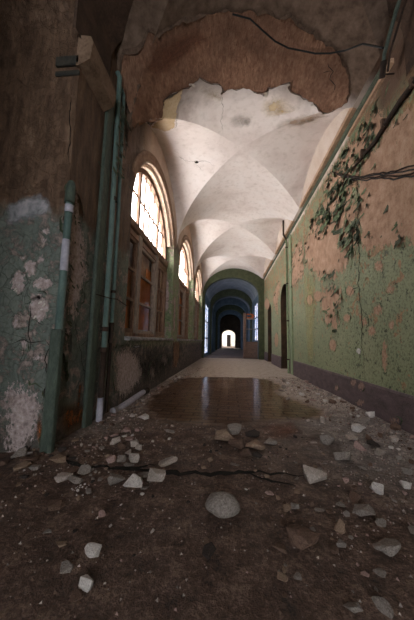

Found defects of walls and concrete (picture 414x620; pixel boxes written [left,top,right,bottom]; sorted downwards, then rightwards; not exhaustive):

spalling [113,8,351,179]
spalling [0,380,45,452]
crack [12,302,49,393]
peeling [9,255,55,330]
peeling [63,191,91,382]
crack [66,460,304,486]
peeling [264,80,414,351]
crack [349,182,369,378]